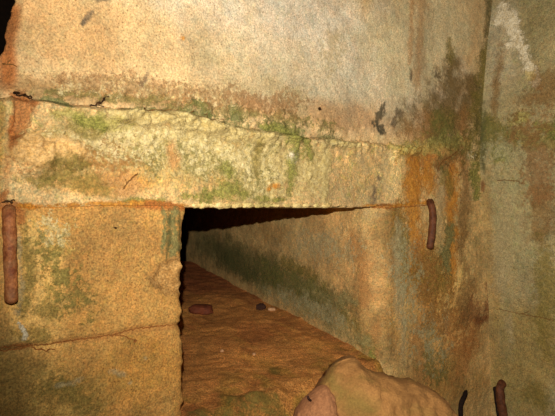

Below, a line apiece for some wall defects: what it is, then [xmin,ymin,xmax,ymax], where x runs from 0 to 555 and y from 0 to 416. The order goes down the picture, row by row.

crack [13,91,34,100]
leakage [41,113,332,206]
leakage [372,102,385,135]
leakage [422,38,487,148]
leakage [485,0,555,105]
rust [364,147,469,306]
crack [0,324,174,352]